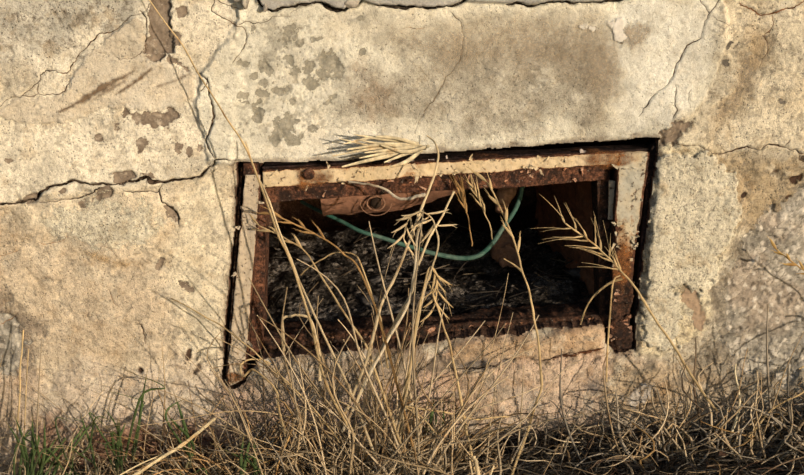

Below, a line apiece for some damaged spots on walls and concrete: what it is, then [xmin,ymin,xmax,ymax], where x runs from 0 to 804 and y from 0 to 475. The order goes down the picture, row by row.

crack [0,1,153,107]
spalling [143,0,189,72]
crack [640,0,737,118]
crack [740,2,803,65]
crack [0,73,239,224]
rust [588,152,631,166]
crack [669,141,804,162]
peeling [606,117,804,388]
spalling [0,313,32,376]
rust [426,354,446,373]